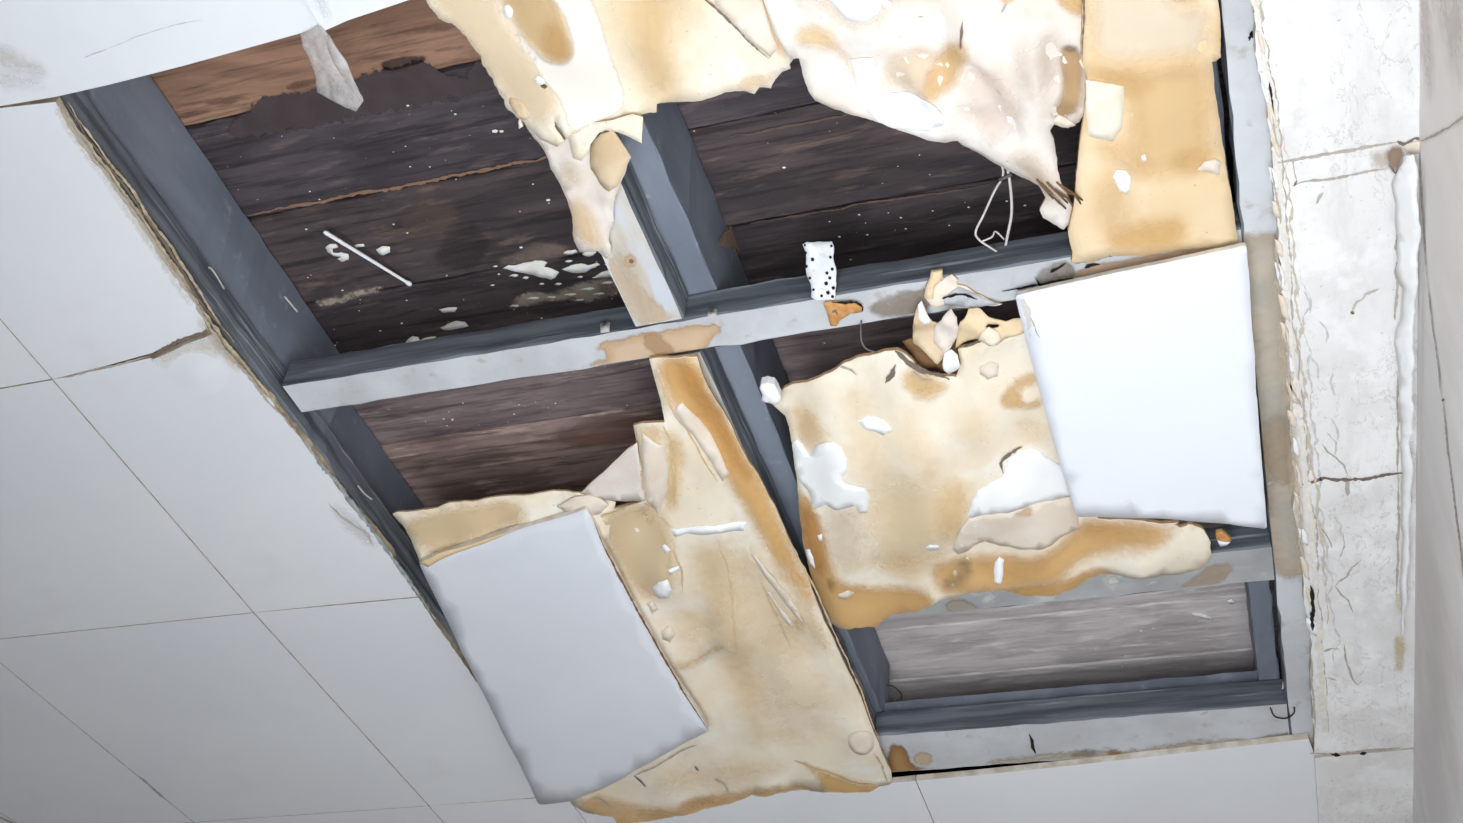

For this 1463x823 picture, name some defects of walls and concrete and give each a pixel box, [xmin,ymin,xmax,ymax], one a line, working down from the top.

damp [228,0,569,140]
peeling [519,0,624,129]
peeling [850,58,943,131]
damp [891,48,964,98]
damp [1024,47,1082,128]
peeling [490,244,619,307]
crack [1278,116,1463,593]
peeling [792,439,870,513]
damp [593,255,1164,629]
peeling [924,448,1079,585]
crack [1321,528,1362,686]
damp [584,787,804,823]